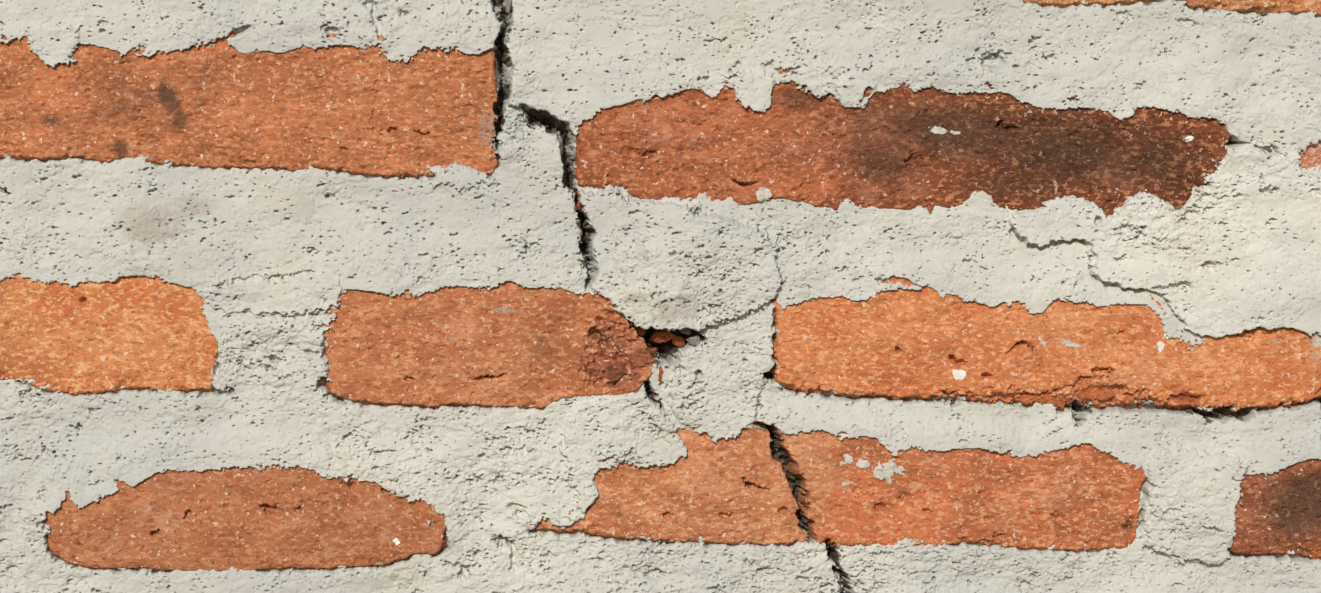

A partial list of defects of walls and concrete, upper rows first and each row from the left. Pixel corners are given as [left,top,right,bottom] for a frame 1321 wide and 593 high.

spalling [1176,0,1303,16]
spalling [570,298,706,396]
spalling [933,367,1206,410]
crack [745,424,852,593]
spalling [1120,509,1139,539]
spalling [960,534,1006,547]
spalling [1275,540,1321,560]